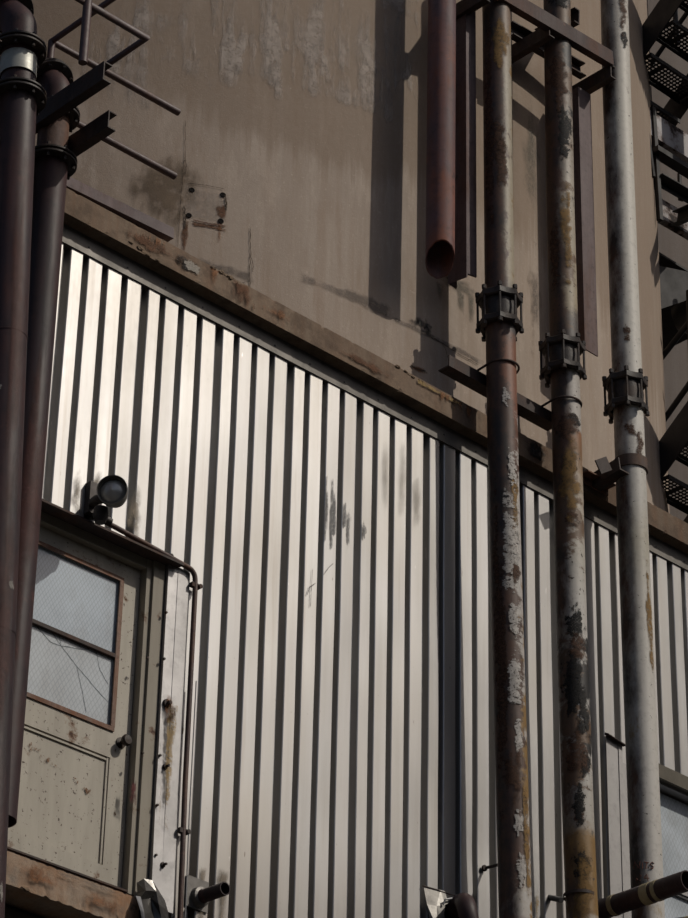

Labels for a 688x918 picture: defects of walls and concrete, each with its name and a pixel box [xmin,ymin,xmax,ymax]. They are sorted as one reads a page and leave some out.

water stain [338,290,388,314]
rust [165,697,184,804]